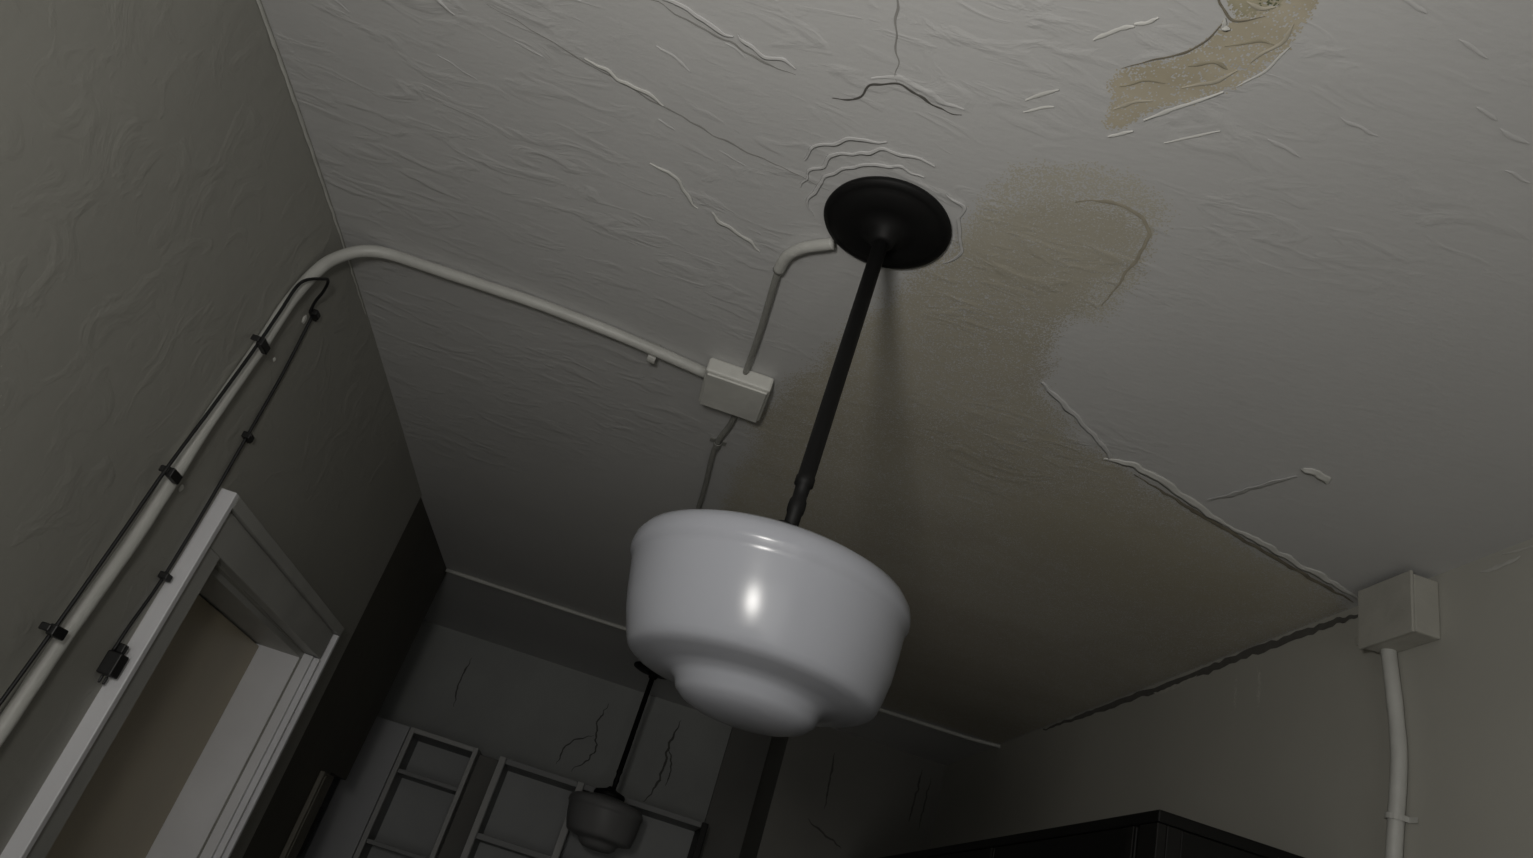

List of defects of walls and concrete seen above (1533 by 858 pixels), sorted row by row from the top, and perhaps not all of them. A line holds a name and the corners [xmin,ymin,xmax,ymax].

crack [833,0,964,115]
spalling [1093,0,1319,137]
damp [717,157,1349,744]